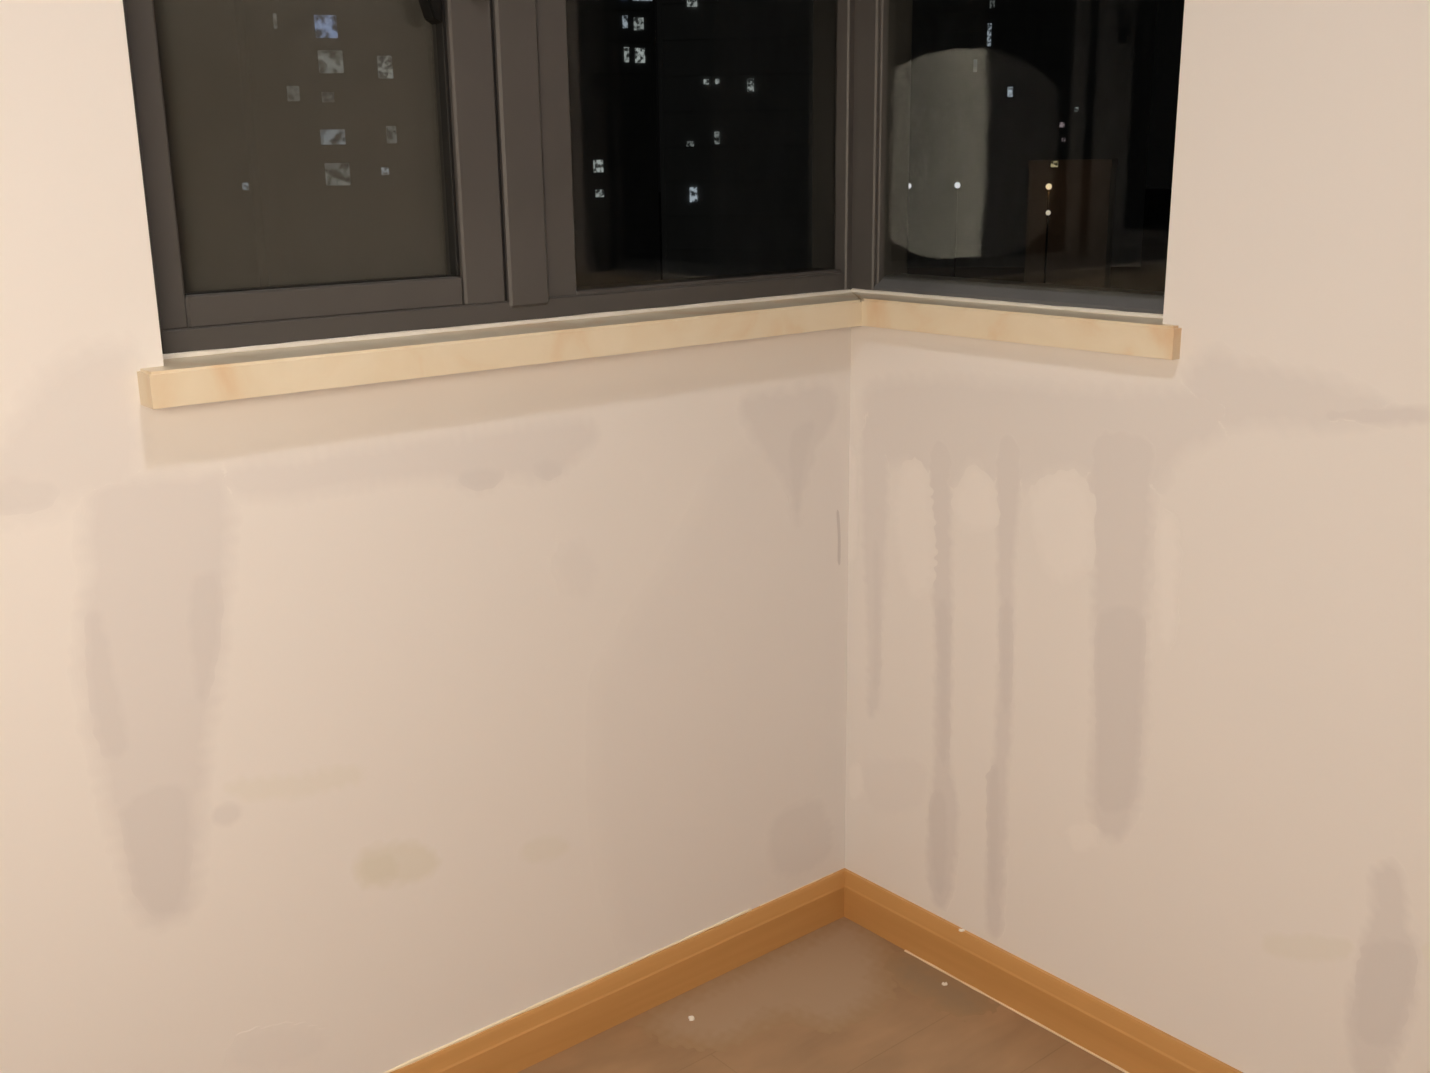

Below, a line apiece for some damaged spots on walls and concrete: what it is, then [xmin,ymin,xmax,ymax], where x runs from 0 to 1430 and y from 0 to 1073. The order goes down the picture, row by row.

water stain [0,330,603,936]
water stain [585,340,1430,963]
water stain [1260,855,1424,1073]